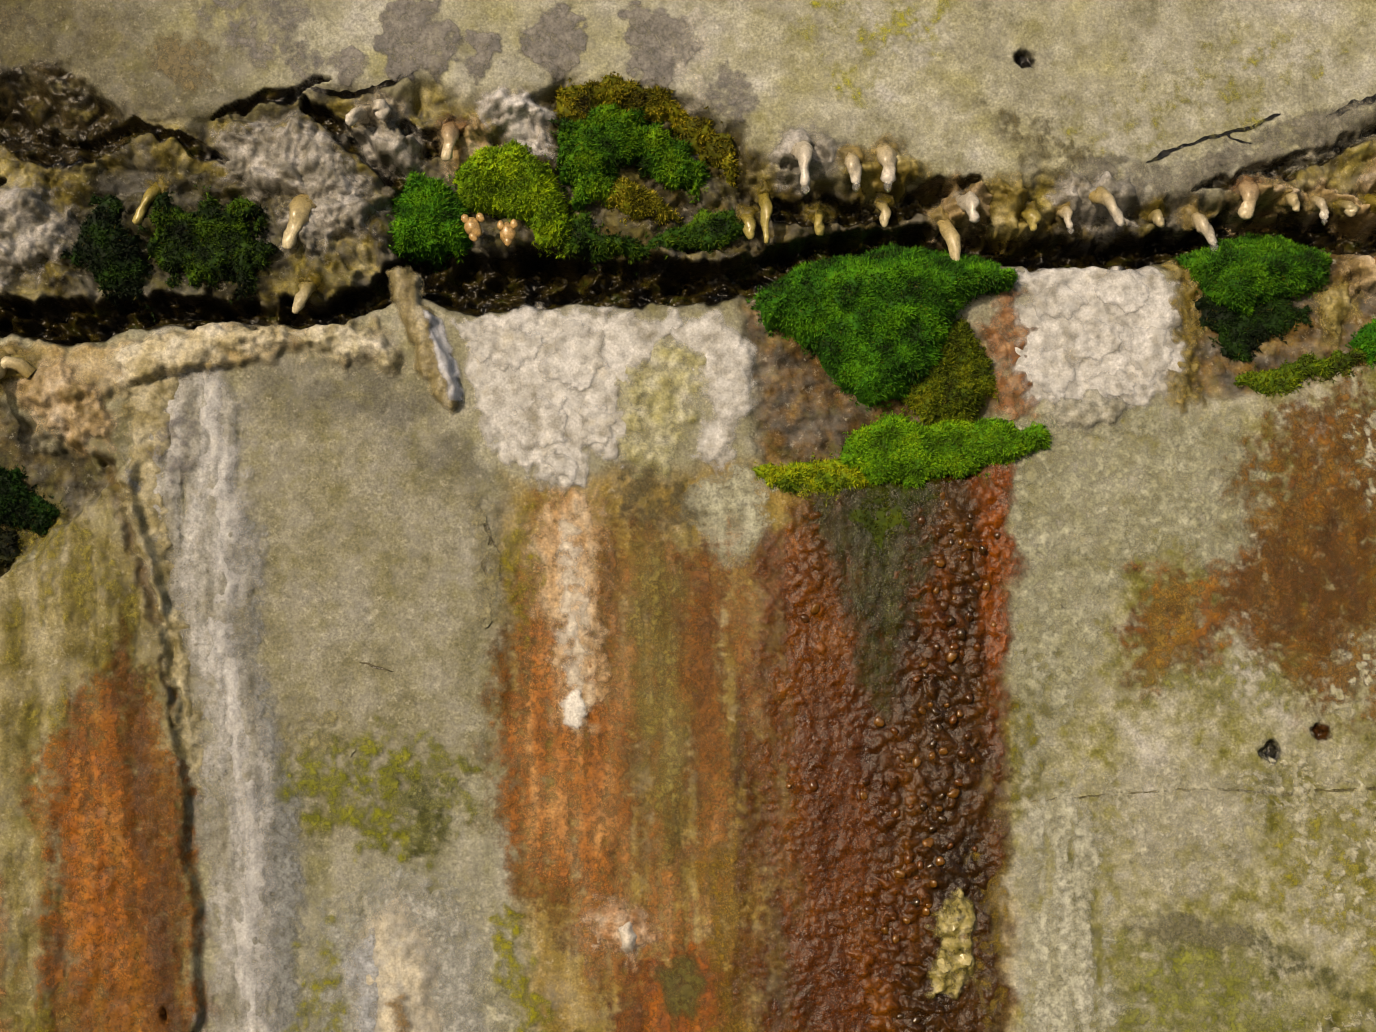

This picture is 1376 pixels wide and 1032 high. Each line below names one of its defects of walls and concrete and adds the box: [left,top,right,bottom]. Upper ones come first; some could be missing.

crack [212,72,452,196]
crack [0,94,1376,346]
rust [22,619,218,1032]
water stain [128,371,305,1032]
rust [482,462,1024,1032]
rust [1114,372,1376,722]